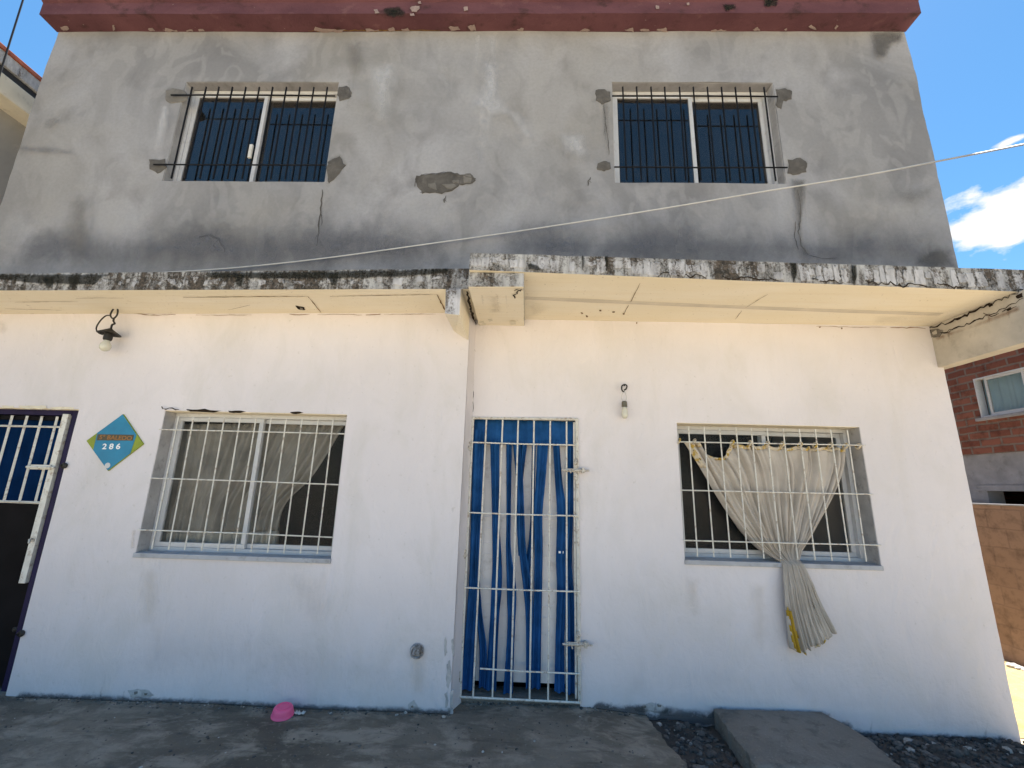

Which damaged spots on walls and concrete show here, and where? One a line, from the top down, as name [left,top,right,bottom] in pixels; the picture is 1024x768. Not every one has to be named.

peeling [366,1,422,32]
crack [316,190,324,235]
flaking render [415,172,476,194]
damp [795,181,803,215]
damp [146,231,448,286]
damp [522,236,586,270]
crack [794,209,842,284]
damp [925,251,947,265]
crack [825,281,1024,334]